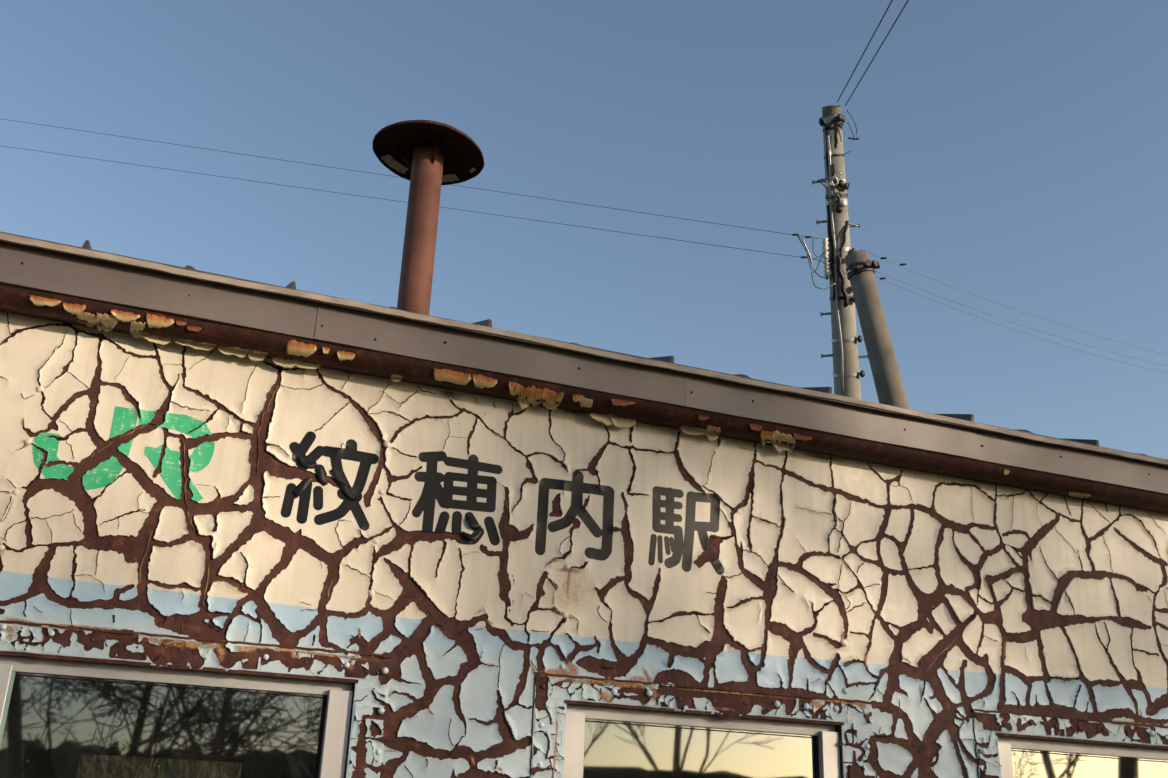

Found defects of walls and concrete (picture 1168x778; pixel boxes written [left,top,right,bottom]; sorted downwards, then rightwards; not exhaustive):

peeling [29,295,355,369]
peeling [433,368,636,428]
peeling [680,415,721,442]
peeling [750,423,812,454]
peeling [549,494,562,517]
crack [0,313,1168,778]
peeling [693,534,733,568]
peeling [0,614,401,778]
corrosion [532,661,658,703]
peeling [535,655,871,778]
peeling [975,712,1168,745]